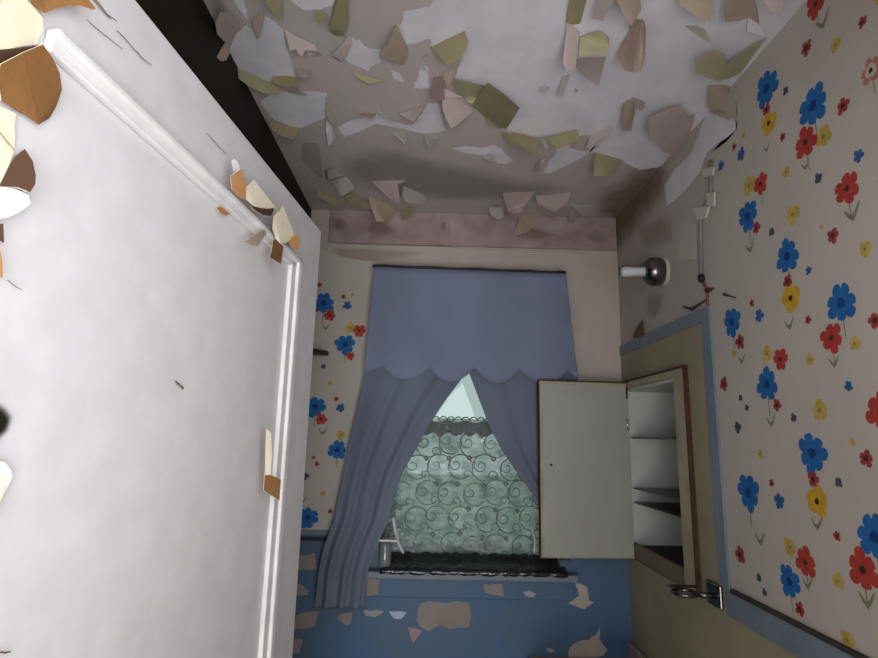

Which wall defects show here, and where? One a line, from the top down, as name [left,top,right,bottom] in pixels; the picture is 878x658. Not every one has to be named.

peeling [29,0,95,13]
peeling [0,44,62,125]
peeling [215,0,806,222]
peeling [0,149,36,278]
peeling [230,159,300,264]
peeling [489,191,596,236]
peeling [0,461,13,501]
peeling [263,429,281,501]
peeling [568,583,594,609]
peeling [293,611,319,654]
peeling [364,601,471,644]
peeling [568,628,607,657]